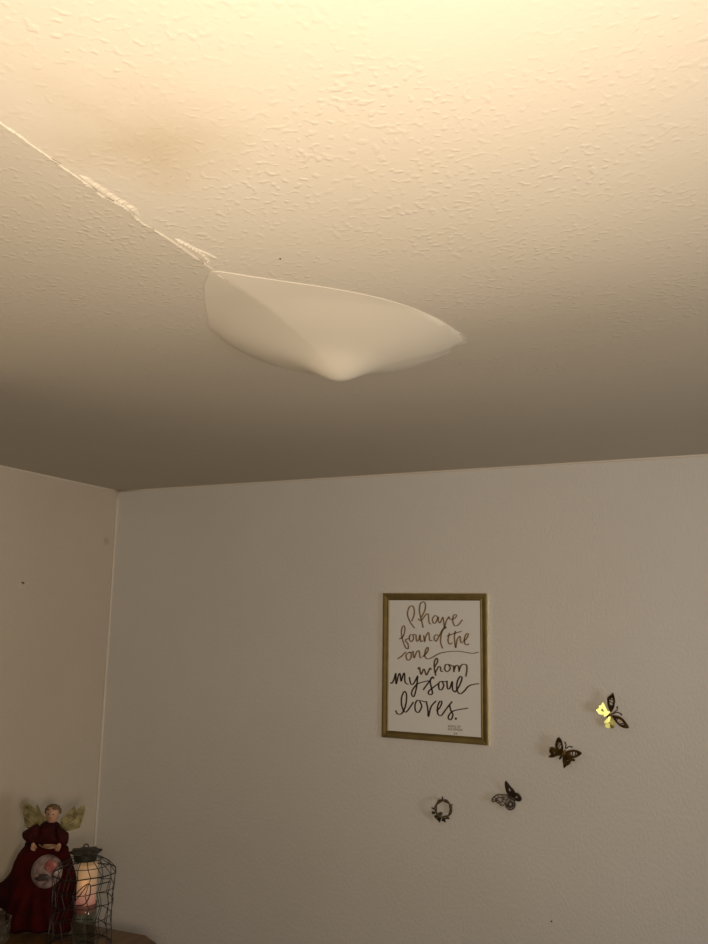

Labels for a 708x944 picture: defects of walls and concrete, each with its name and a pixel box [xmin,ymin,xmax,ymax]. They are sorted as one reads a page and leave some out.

crack [0,122,218,272]